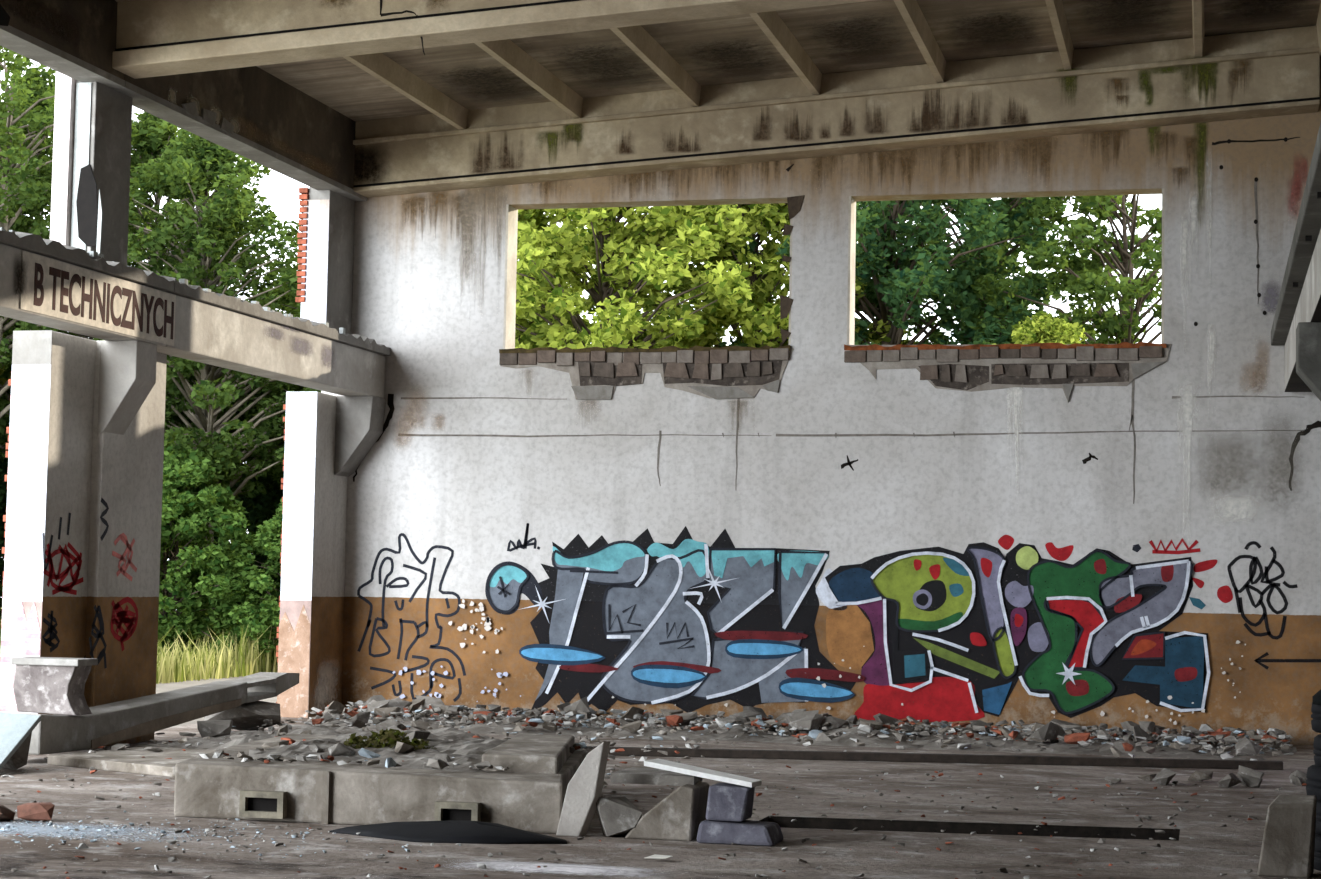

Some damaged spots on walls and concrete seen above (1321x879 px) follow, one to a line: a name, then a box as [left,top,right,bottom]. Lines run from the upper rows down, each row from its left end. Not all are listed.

leakage [473,138,514,173]
leakage [543,124,581,158]
leakage [619,140,632,153]
leakage [667,136,700,152]
leakage [754,115,770,140]
leakage [785,111,884,140]
leakage [403,192,462,224]
leakage [1148,123,1211,270]
spalling [499,345,794,400]
spalling [844,342,1171,402]